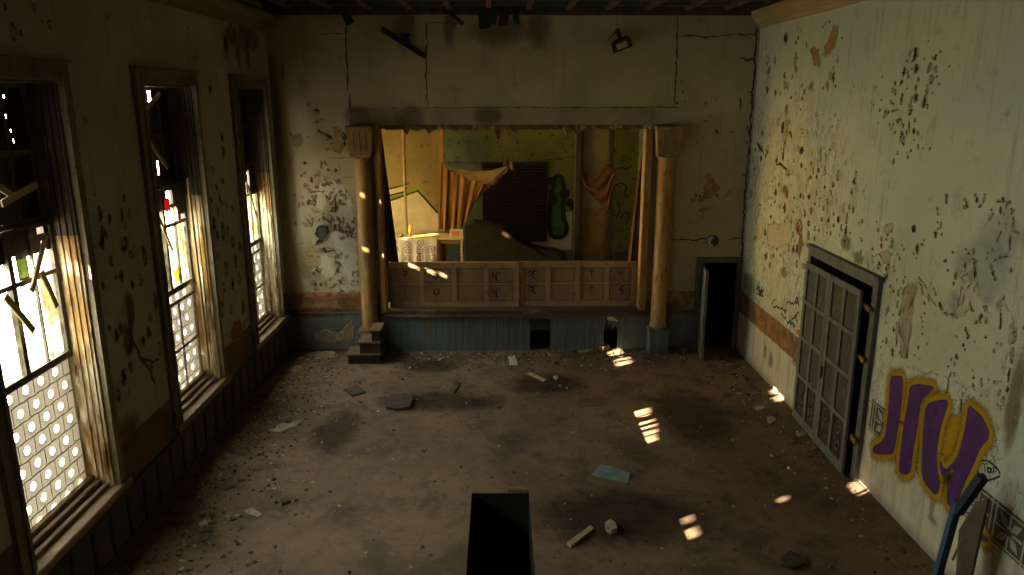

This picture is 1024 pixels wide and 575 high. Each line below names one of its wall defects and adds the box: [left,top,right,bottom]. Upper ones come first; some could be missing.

flaking render [288,102,360,294]
crack [325,16,758,257]
flaking render [702,18,1024,420]